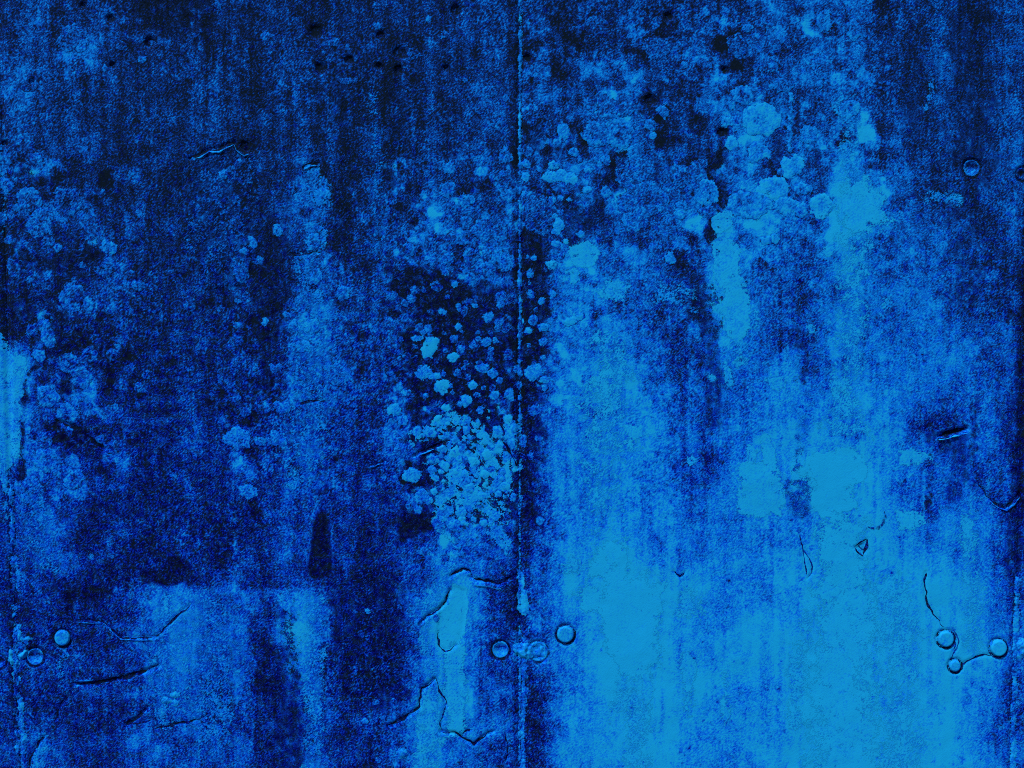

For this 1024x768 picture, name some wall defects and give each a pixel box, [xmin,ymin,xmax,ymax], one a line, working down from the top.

water stain [0,333,38,519]
water stain [0,144,55,232]
water stain [2,296,76,357]
water stain [6,234,104,288]
water stain [59,372,74,402]
crack [184,142,250,185]
water stain [366,58,632,546]
water stain [645,125,760,429]
water stain [899,0,1001,313]
crack [29,605,201,768]
spalling [412,555,487,768]
crack [923,573,991,665]